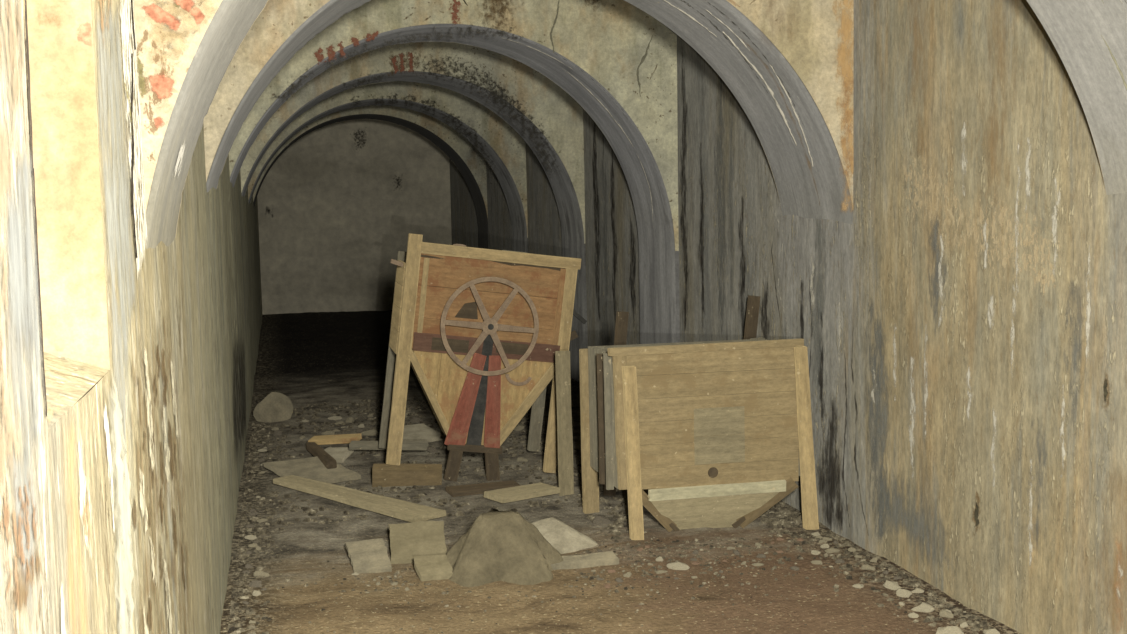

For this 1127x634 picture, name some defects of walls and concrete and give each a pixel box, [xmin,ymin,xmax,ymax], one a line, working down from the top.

flaking render [97,0,213,276]
flaking render [275,27,653,216]
damp [800,223,945,557]
damp [1010,138,1031,360]
damp [1028,440,1046,563]
damp [1052,178,1060,274]
damp [1060,385,1074,465]
damp [1074,253,1091,368]